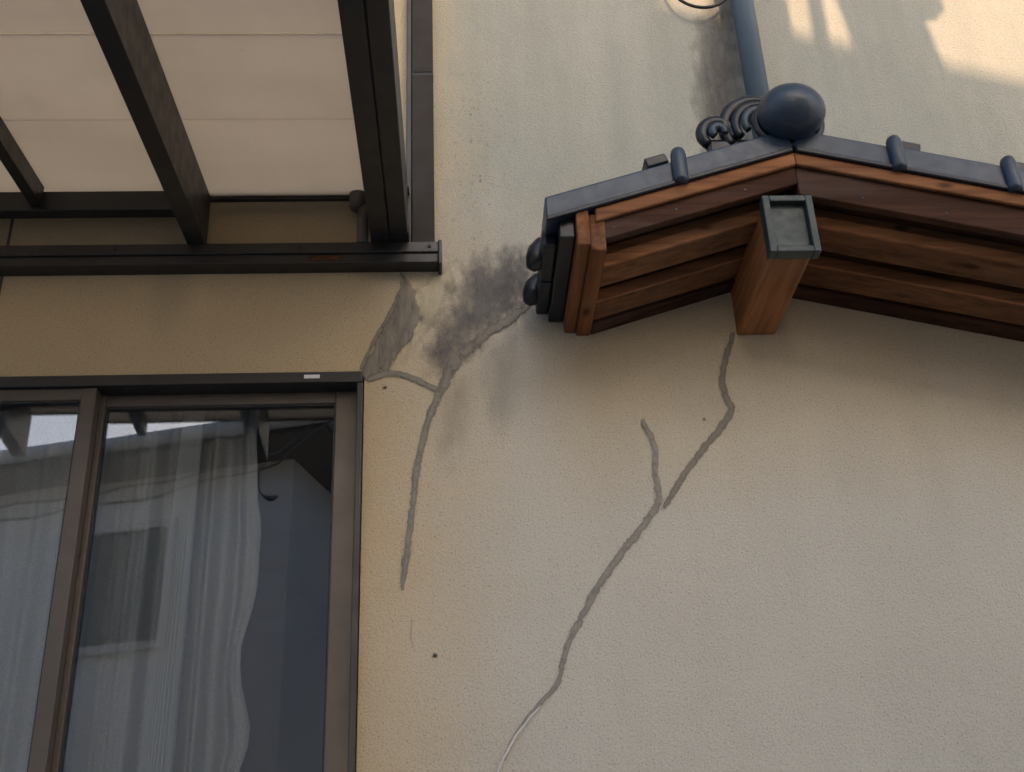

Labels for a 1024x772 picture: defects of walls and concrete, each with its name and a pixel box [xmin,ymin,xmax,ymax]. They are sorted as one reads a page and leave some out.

crack [367,304,530,590]
crack [496,333,735,772]